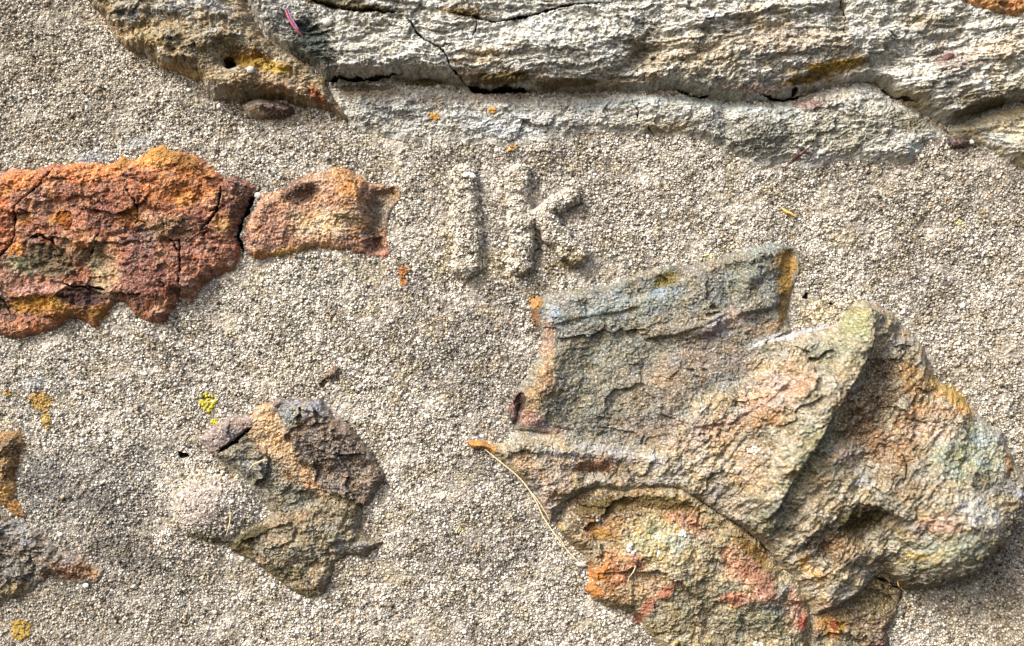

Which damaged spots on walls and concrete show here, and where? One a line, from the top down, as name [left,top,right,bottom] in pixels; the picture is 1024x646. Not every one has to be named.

crack [391,13,529,94]
crack [329,72,403,83]
crack [678,90,708,99]
crack [759,94,804,102]
crack [881,90,919,103]